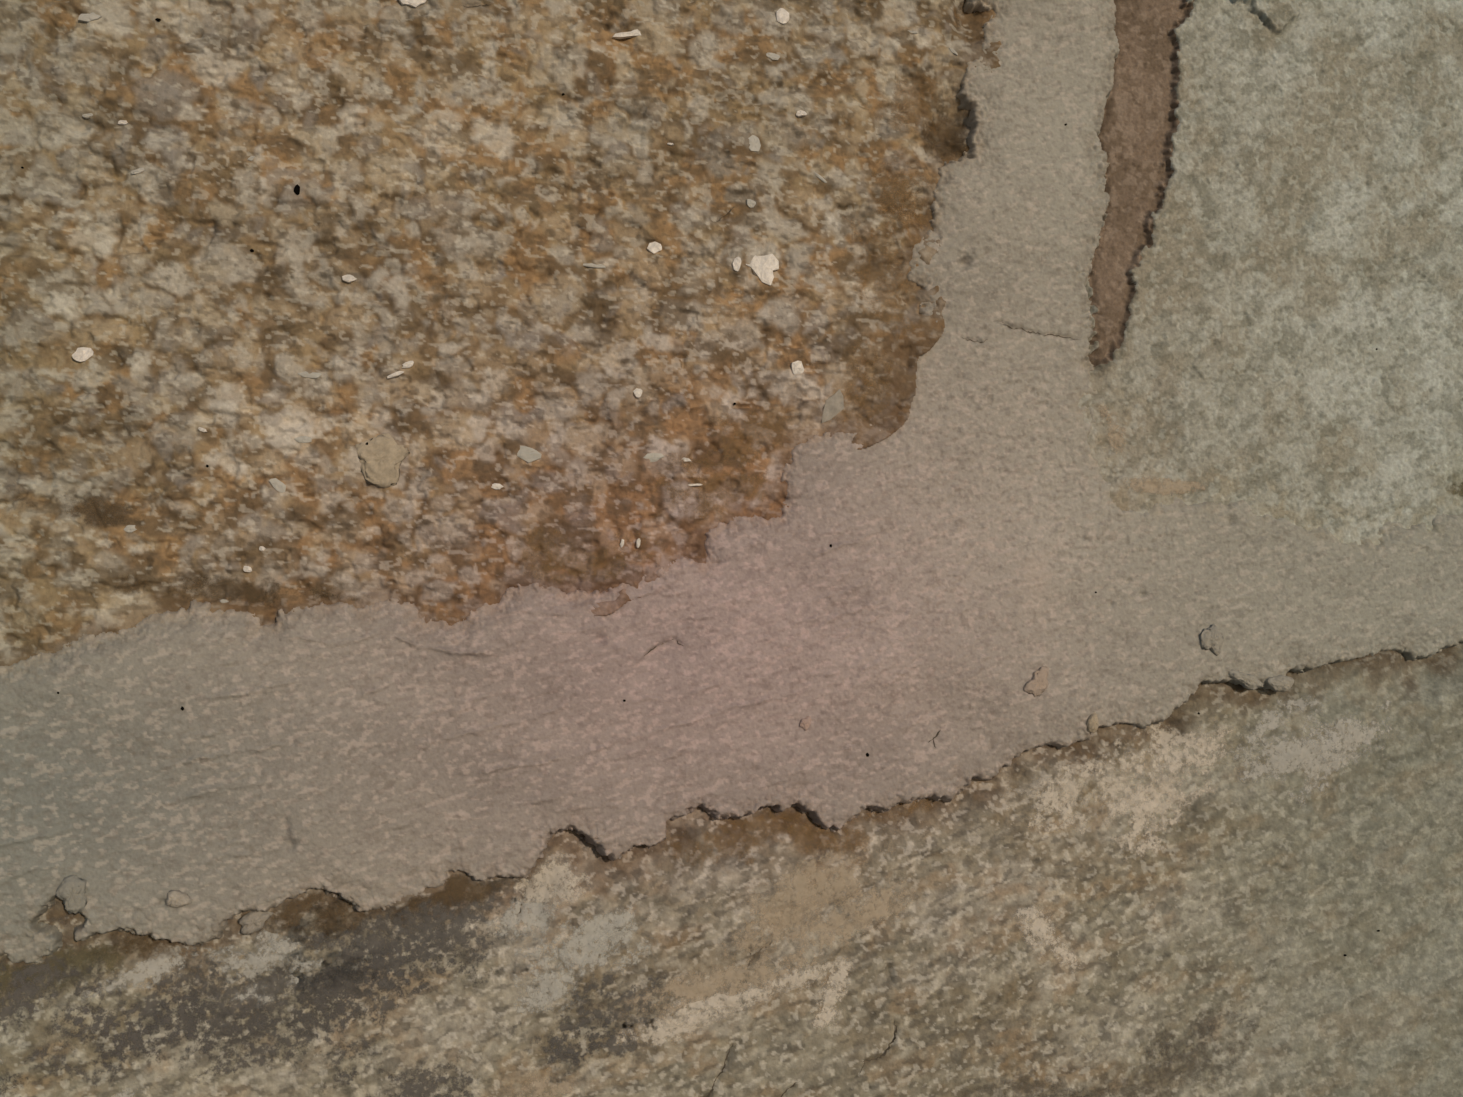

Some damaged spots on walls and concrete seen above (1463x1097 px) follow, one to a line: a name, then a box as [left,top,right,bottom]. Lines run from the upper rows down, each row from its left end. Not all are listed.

peeling [399,0,427,8]
peeling [776,8,789,24]
peeling [612,29,641,39]
peeling [748,135,761,152]
peeling [1088,0,1194,367]
peeling [647,242,662,254]
peeling [732,254,779,286]
peeling [72,347,94,362]
peeling [387,361,414,379]
peeling [791,361,804,374]
peeling [517,446,542,463]
peeling [269,478,286,493]